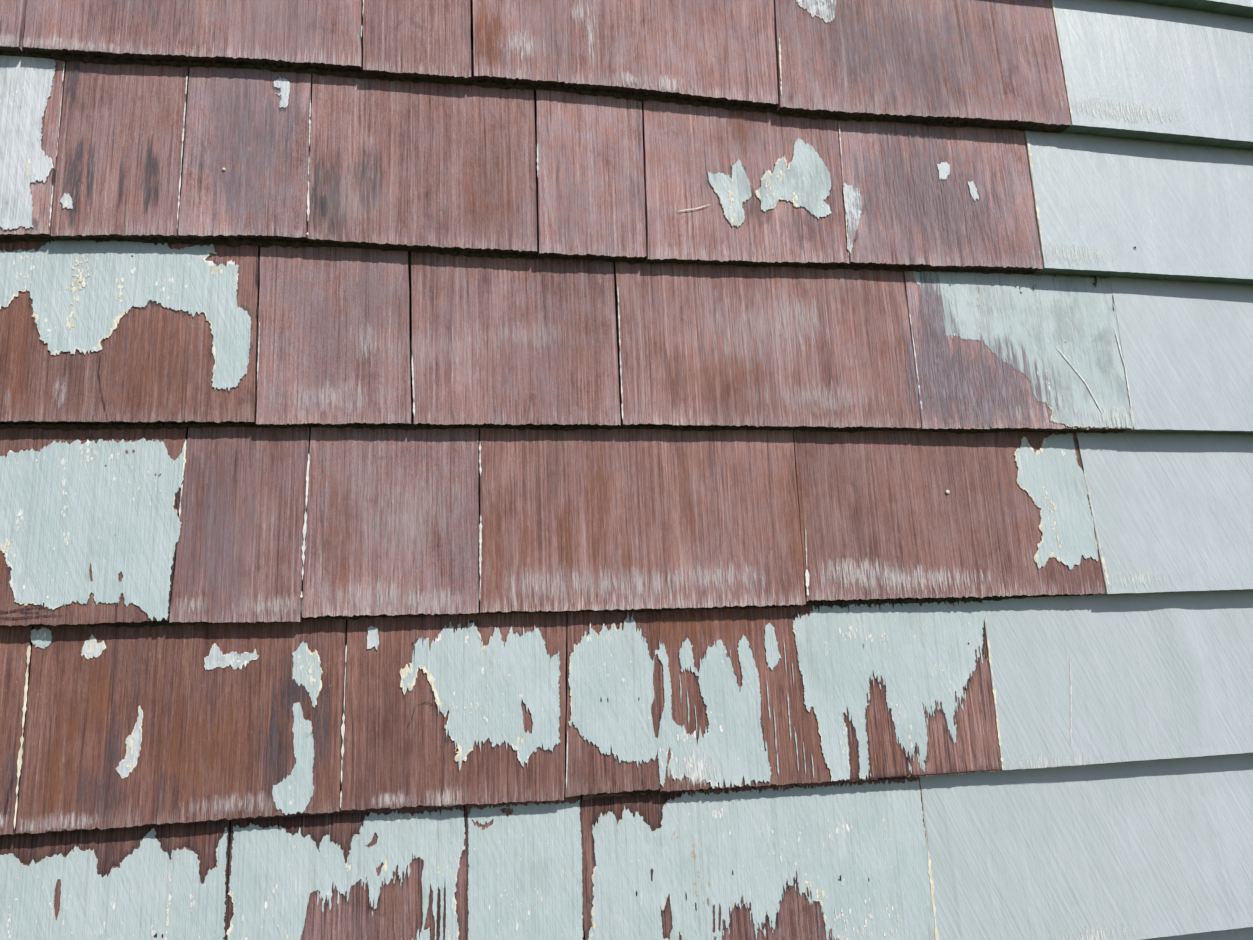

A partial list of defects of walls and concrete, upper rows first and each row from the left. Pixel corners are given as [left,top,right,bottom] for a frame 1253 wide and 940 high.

peeling [796,0,836,23]
peeling [0,55,56,230]
peeling [60,193,73,209]
peeling [707,138,862,253]
peeling [0,240,252,391]
peeling [913,271,1134,570]
peeling [0,437,187,621]
peeling [0,598,1001,940]